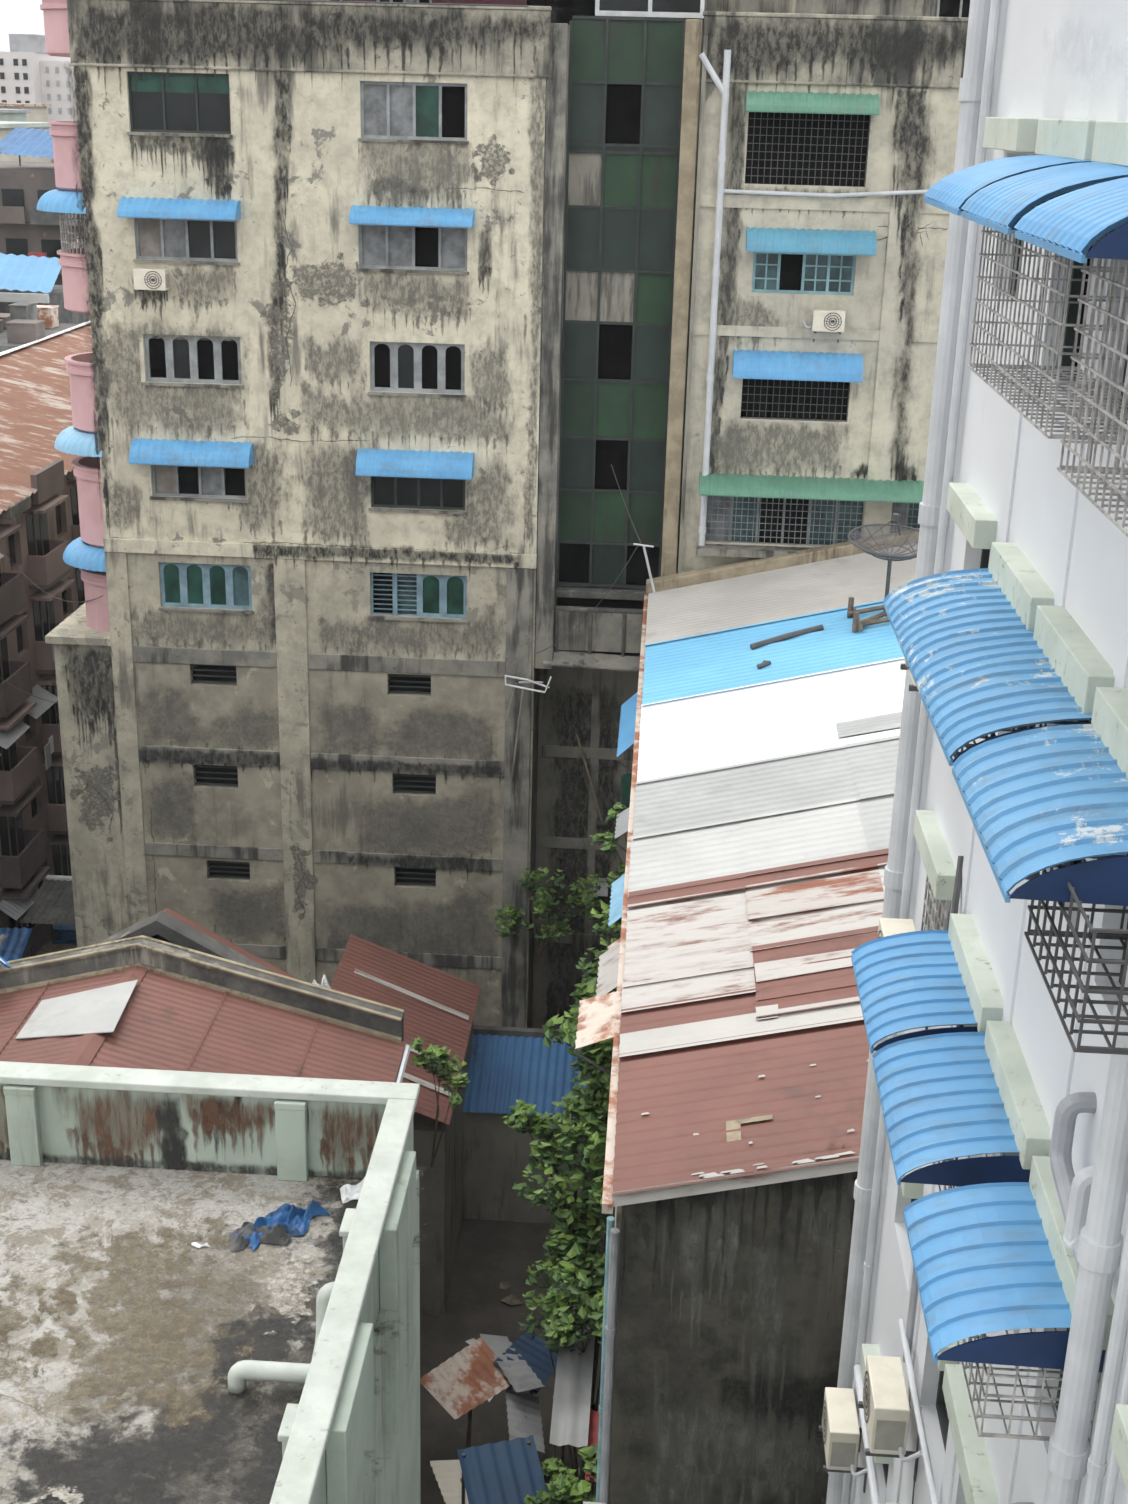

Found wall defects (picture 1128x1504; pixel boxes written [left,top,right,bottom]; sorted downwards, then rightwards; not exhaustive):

damp [707,19,967,482]
damp [68,2,559,651]
damp [320,609,502,660]
damp [65,646,122,828]
damp [139,689,280,835]
damp [310,709,501,781]
damp [348,795,493,876]
rust [0,1087,10,1156]
rust [74,1093,274,1166]
rust [307,1107,379,1175]
damp [0,1171,367,1504]
damp [617,1171,858,1504]